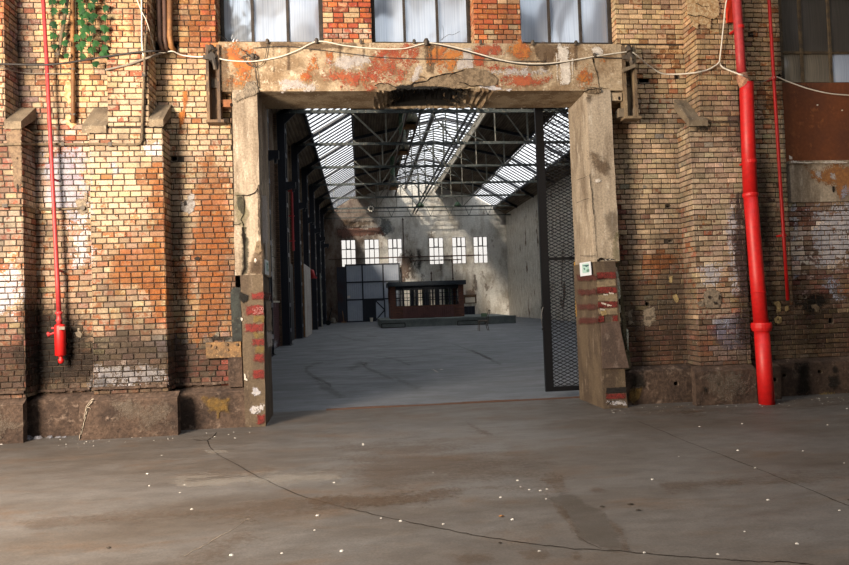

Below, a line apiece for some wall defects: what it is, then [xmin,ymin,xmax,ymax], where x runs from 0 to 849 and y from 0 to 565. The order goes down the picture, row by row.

flaking render [686,0,720,29]
spalling [299,39,553,107]
peeling [576,63,601,94]
peeling [804,163,849,200]
spalling [254,185,262,263]
water stain [0,264,170,387]
crack [194,432,813,565]